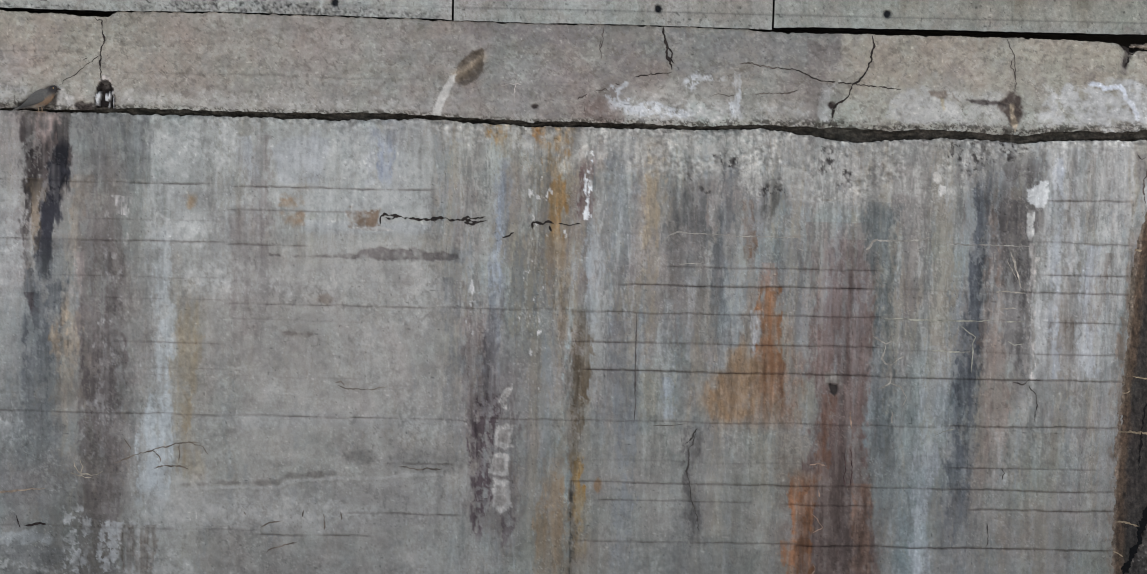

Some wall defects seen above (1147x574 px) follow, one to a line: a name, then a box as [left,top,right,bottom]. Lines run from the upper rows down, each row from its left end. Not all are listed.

spalling [451,46,488,87]
efflorescence [579,69,743,124]
crack [714,35,901,126]
corrosion [927,89,1028,129]
peeling [267,205,473,266]
crack [379,213,580,238]
water stain [10,110,178,574]
corrosion [530,158,602,574]
crack [634,313,699,530]
spalling [429,100,1147,574]
corrosion [700,200,881,574]
crack [0,488,46,527]